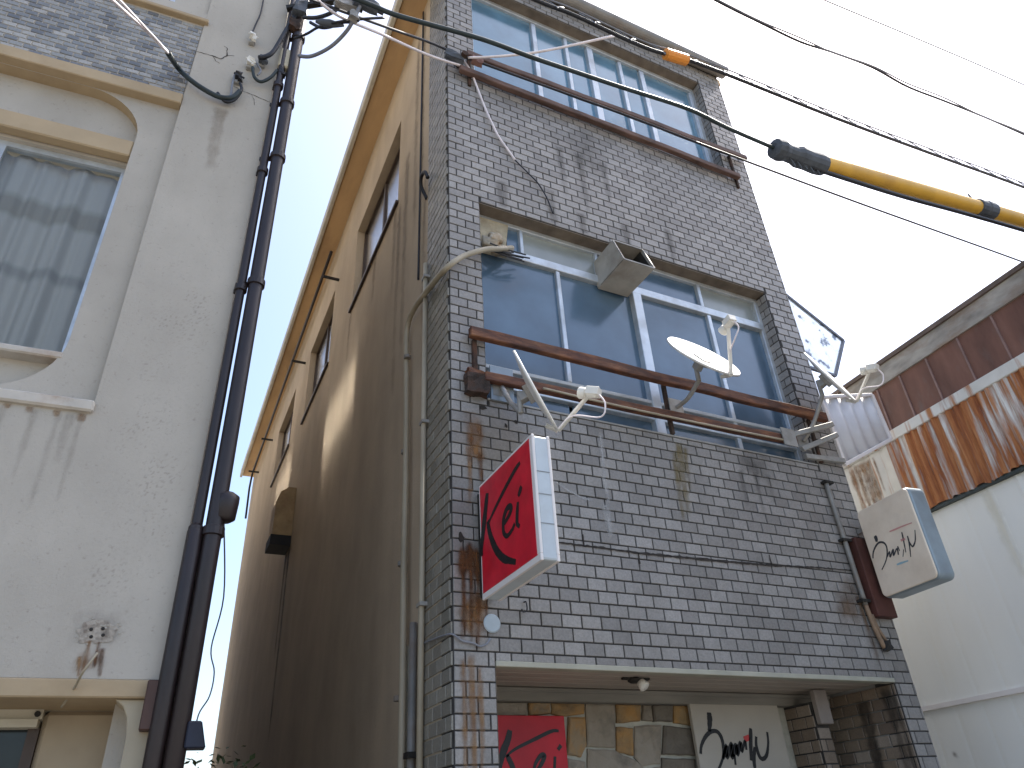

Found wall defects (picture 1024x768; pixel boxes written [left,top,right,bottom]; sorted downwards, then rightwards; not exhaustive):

rust [850,461,881,506]
rust [886,367,1024,509]
rust [459,543,487,639]
rust [78,641,103,674]